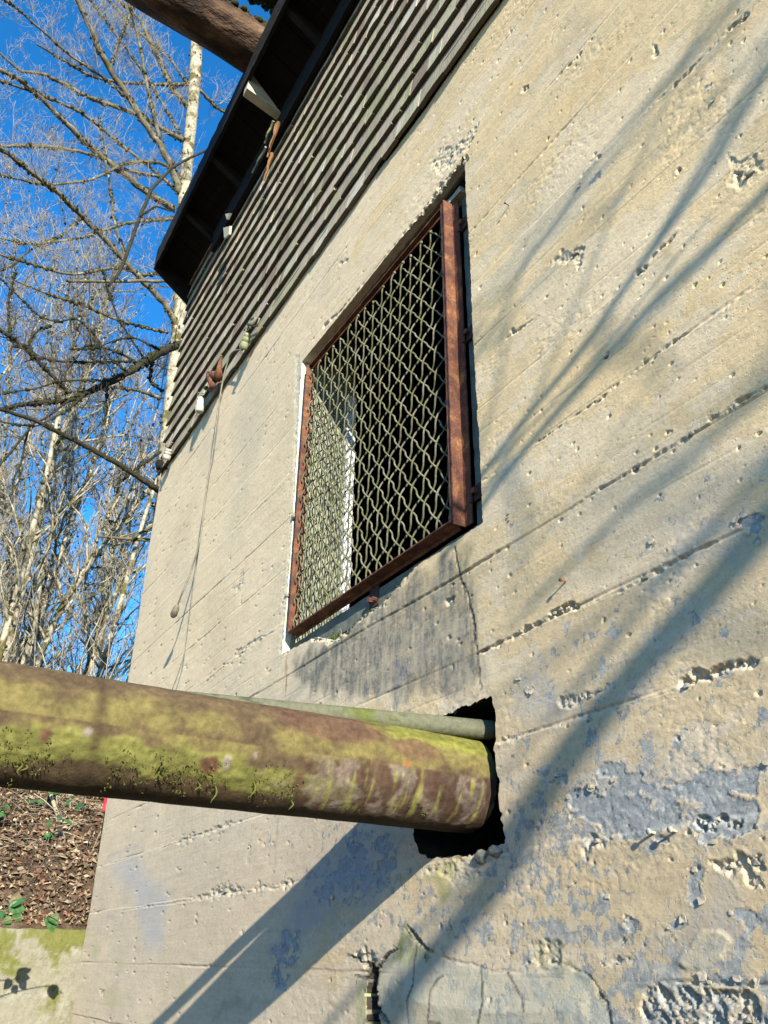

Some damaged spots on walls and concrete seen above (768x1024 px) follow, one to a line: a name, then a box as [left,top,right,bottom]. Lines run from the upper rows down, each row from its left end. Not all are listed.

spalling [724,151,768,192]
spalling [322,122,479,329]
spalling [551,246,586,273]
crack [453,545,489,690]
spalling [676,654,761,690]
peeling [550,757,768,930]
peeling [623,917,642,933]
crack [346,924,445,1024]
spalling [637,970,768,1024]